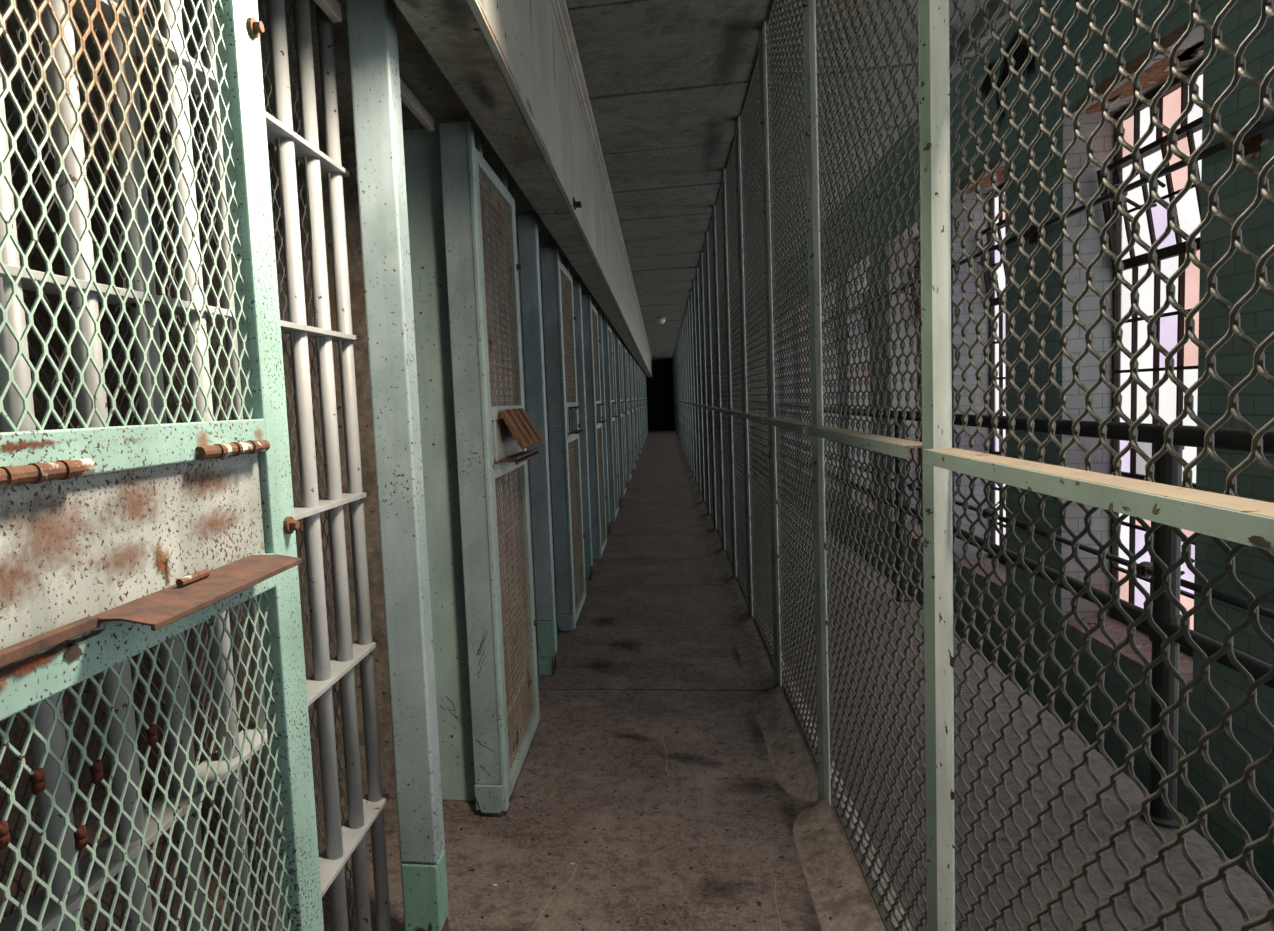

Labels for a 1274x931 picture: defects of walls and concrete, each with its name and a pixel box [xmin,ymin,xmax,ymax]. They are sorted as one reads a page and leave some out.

rust [2,439,55,452]
rust [17,504,85,559]
rust [0,562,25,600]
rust [154,542,170,584]